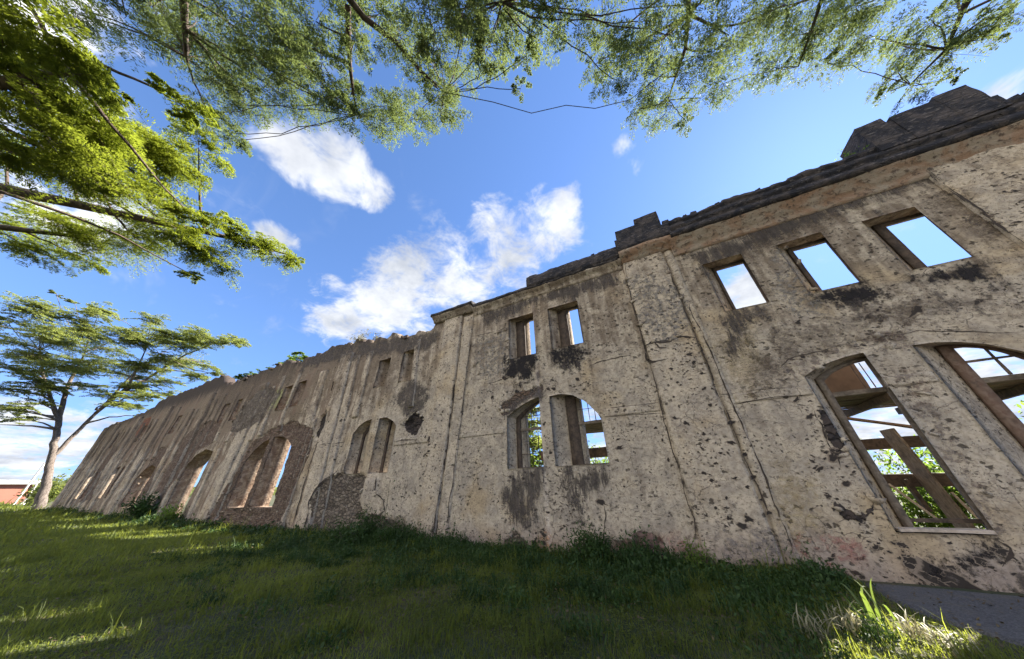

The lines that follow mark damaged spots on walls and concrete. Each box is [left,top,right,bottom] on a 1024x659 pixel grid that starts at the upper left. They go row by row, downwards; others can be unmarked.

leakage [681,167,1001,276]
spalling [136,387,436,536]
leakage [214,331,440,417]
leakage [501,464,547,531]
leakage [499,342,591,423]
leakage [560,464,610,526]
crack [595,266,1012,556]
leakage [719,262,1007,395]